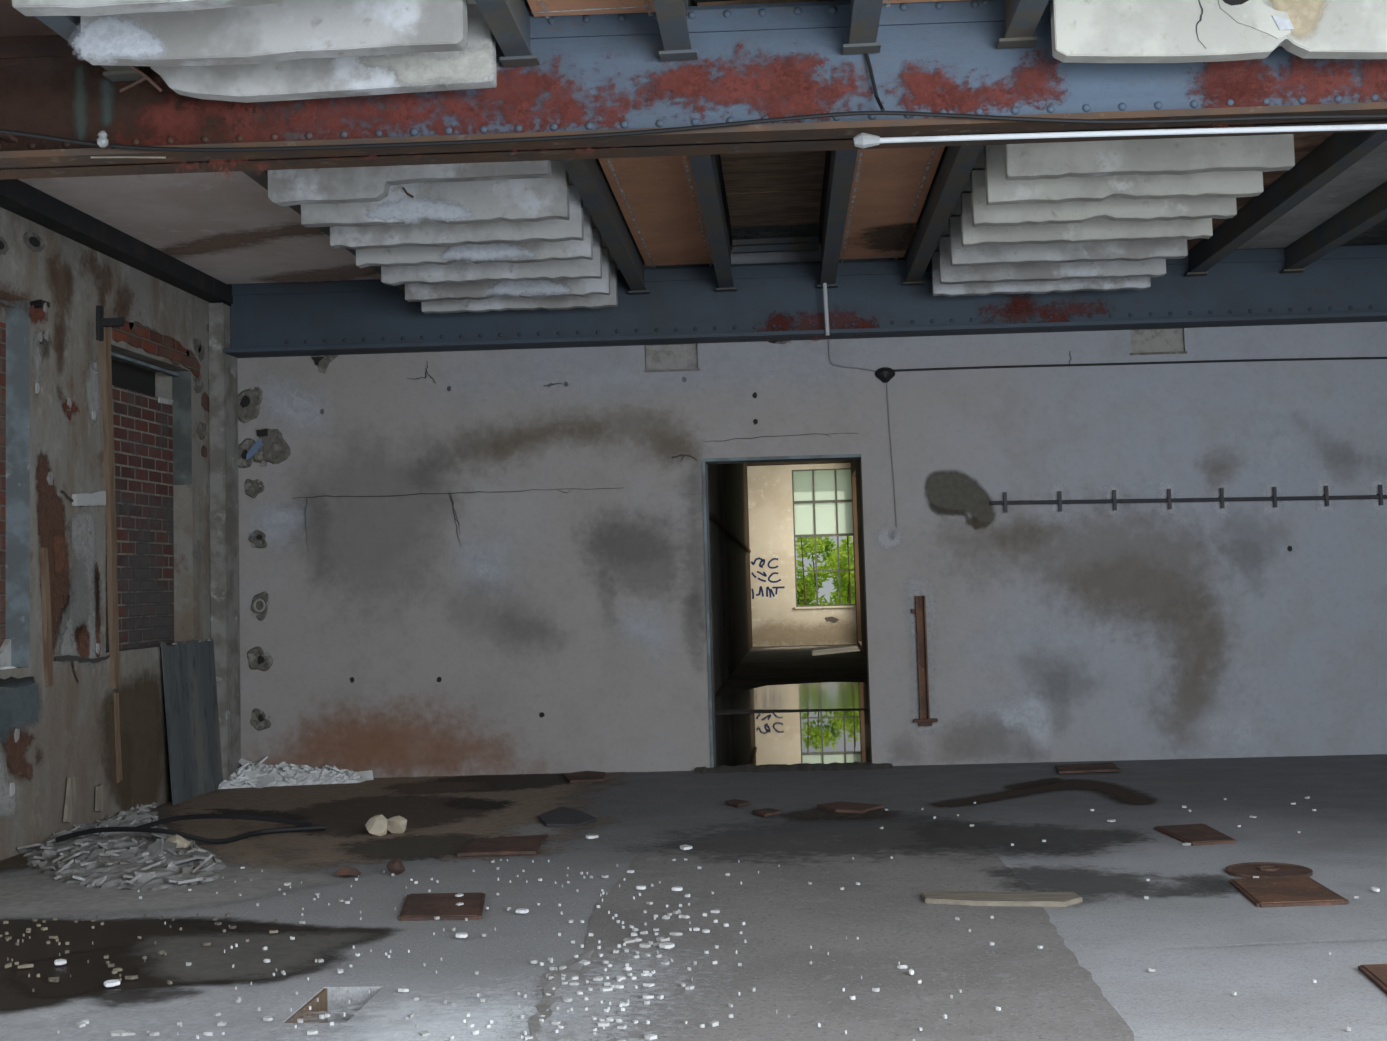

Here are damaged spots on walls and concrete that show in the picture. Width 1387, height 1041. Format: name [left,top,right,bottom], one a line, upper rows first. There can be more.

crack [1196,0,1207,49]
peeling [29,302,51,395]
peeling [59,326,100,423]
flaking render [112,319,209,458]
spalling [238,387,291,498]
spalling [35,452,103,665]
spalling [248,530,268,548]
spalling [251,591,270,621]
spalling [0,639,35,688]
spalling [247,646,273,672]
damp [990,697,1056,745]
spalling [0,726,42,818]